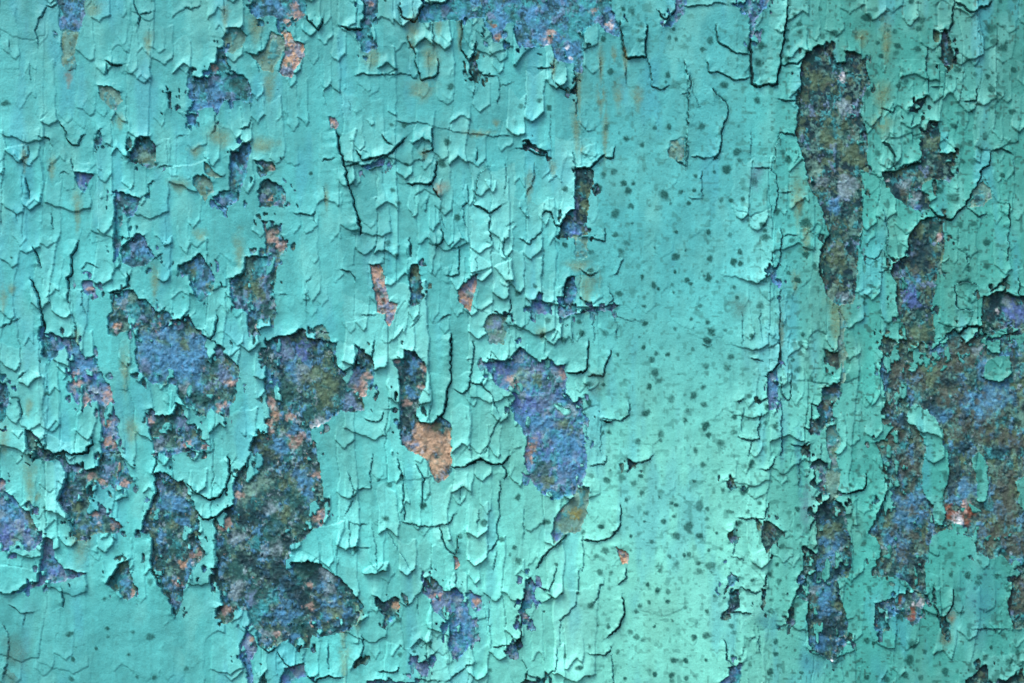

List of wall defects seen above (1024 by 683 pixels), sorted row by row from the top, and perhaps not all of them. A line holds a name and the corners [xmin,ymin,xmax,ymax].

peeling [355,0,386,62]
crack [355,0,515,106]
peeling [414,0,626,102]
crack [926,0,993,103]
crack [2,214,94,341]
crack [187,456,249,521]
peeling [0,132,490,683]
crack [257,115,628,683]
peeling [478,277,620,544]
crack [538,0,867,531]
peeling [716,40,1024,671]
crack [929,143,1021,335]